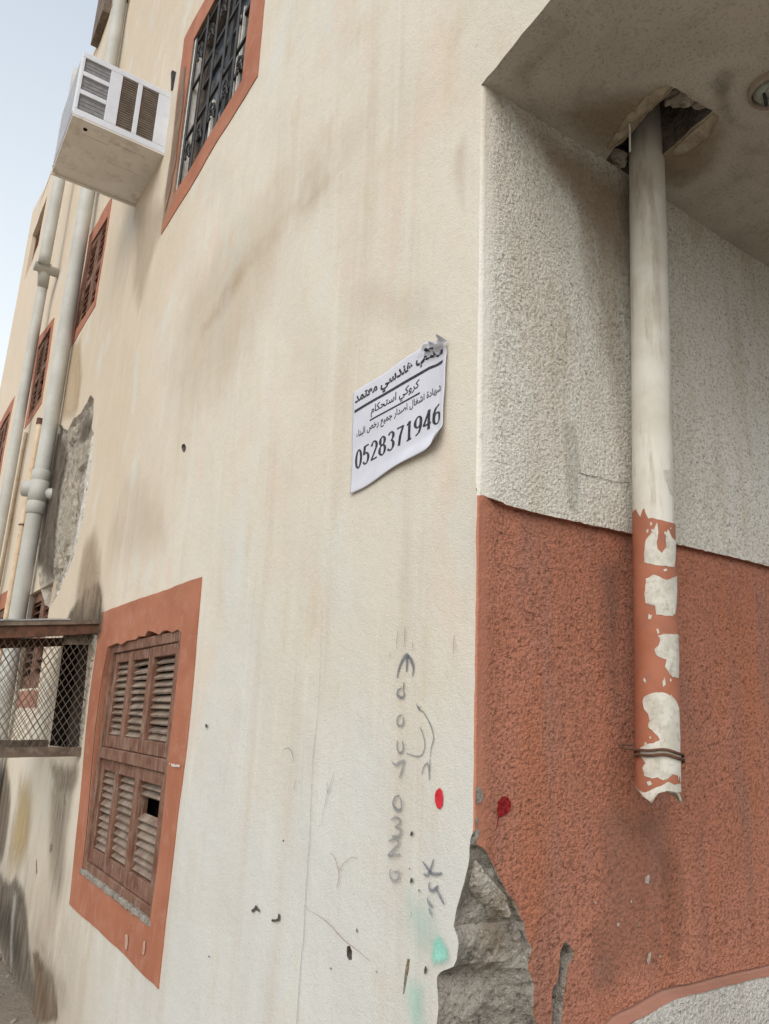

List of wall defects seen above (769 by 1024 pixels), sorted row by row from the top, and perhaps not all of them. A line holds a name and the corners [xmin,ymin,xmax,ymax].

spalling [606,85,719,175]
flaking render [38,395,94,607]
leakage [13,791,29,856]
leakage [0,876,57,1023]
spalling [424,818,536,1024]
spalling [551,940,574,1024]